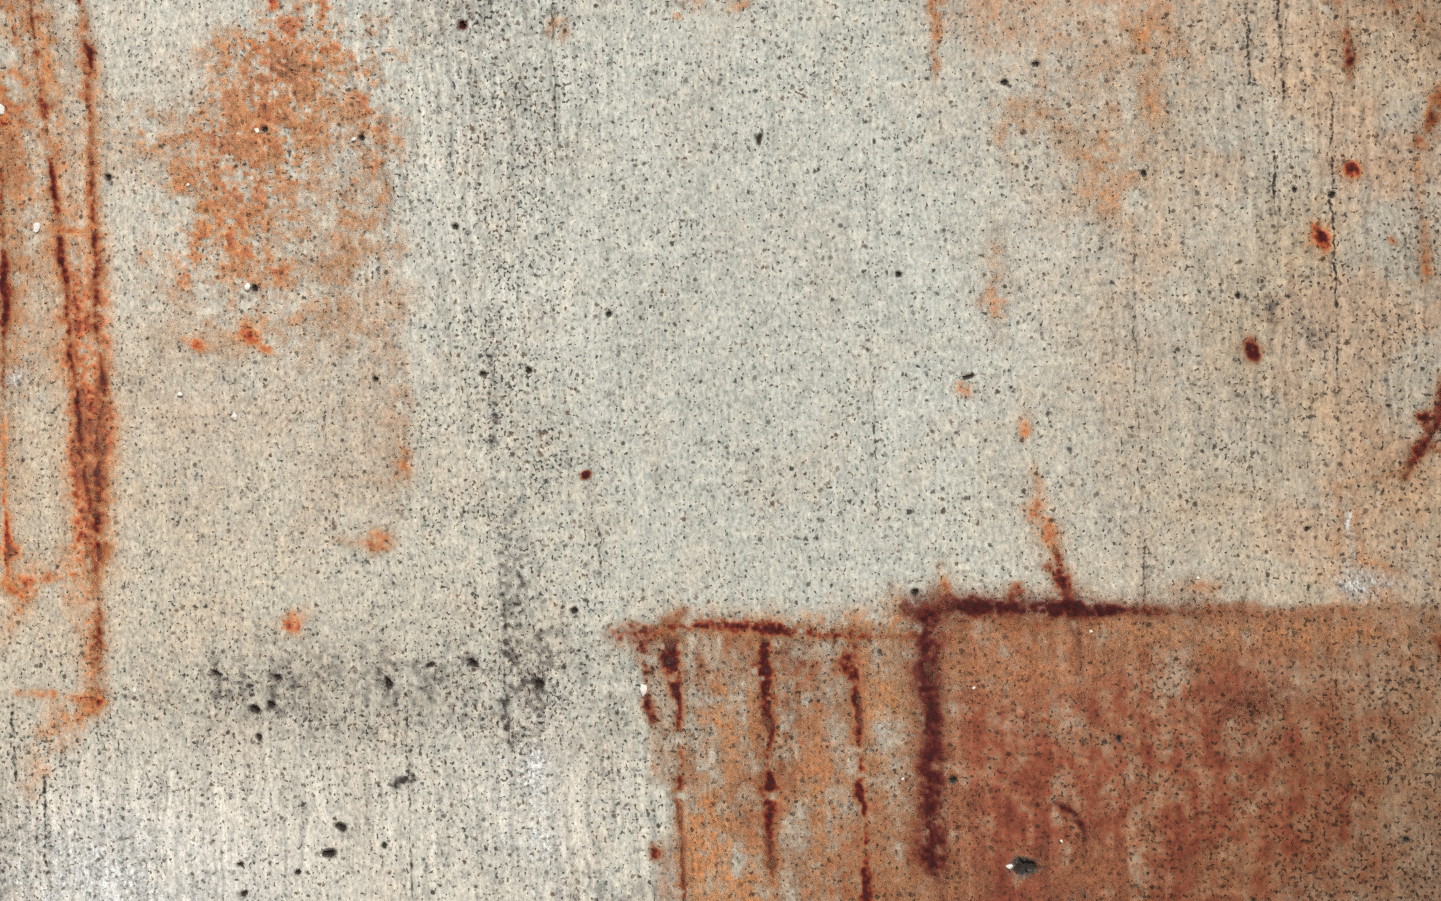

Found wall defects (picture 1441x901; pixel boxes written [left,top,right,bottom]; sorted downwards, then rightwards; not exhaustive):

rust [1342,29,1357,78]
rust [139,0,402,291]
rust [1416,88,1441,196]
rust [1310,222,1332,253]
rust [0,0,118,735]
rust [183,338,206,352]
rust [239,316,271,353]
rust [1244,336,1261,364]
rust [1373,383,1441,480]
rust [398,446,410,477]
rust [611,482,1441,901]